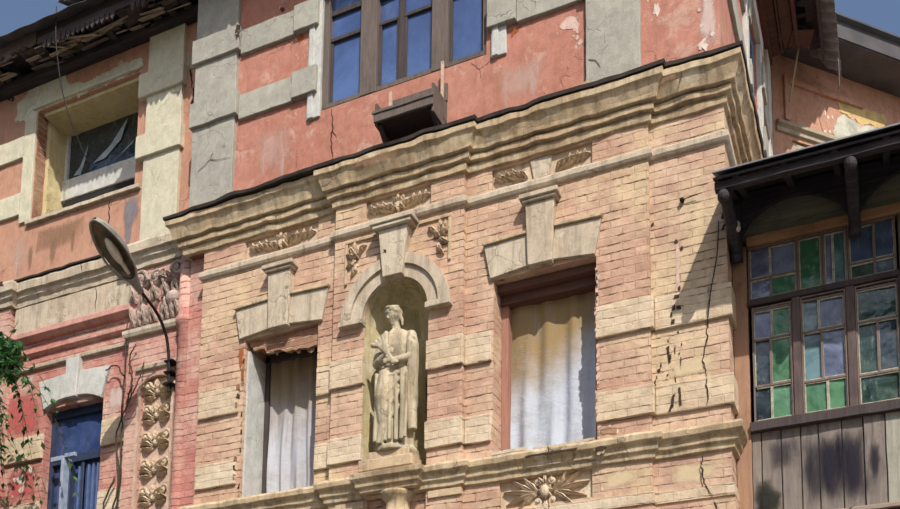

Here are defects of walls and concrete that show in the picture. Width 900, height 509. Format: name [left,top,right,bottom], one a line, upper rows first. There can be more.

peeling [556,16,583,49]
peeling [698,0,715,51]
crack [328,109,336,159]
flaking render [821,101,887,138]
spalling [654,286,682,412]
crack [702,287,710,402]
crack [700,455,717,509]
mould [756,480,781,509]